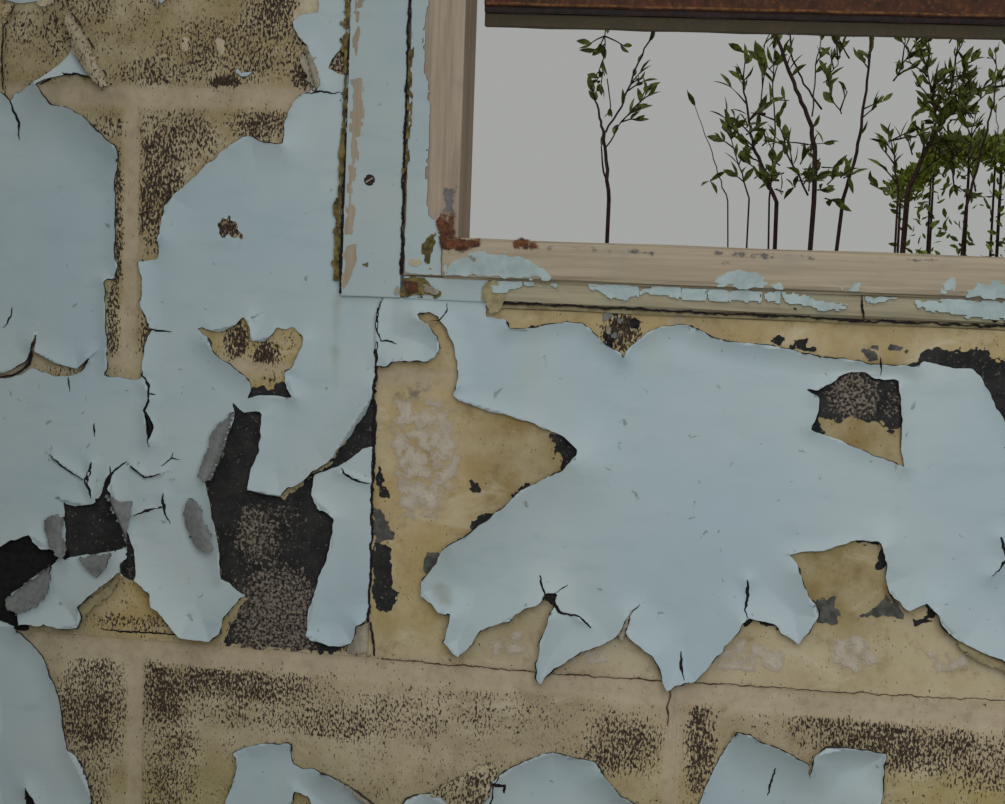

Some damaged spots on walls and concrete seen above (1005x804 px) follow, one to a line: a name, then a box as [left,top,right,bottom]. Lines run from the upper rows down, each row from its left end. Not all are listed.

peeling [0,0,349,384]
rust [436,215,479,250]
rust [513,238,537,249]
crack [51,373,180,523]
peeling [0,232,1005,804]
crack [341,298,1005,726]
crack [489,777,506,804]